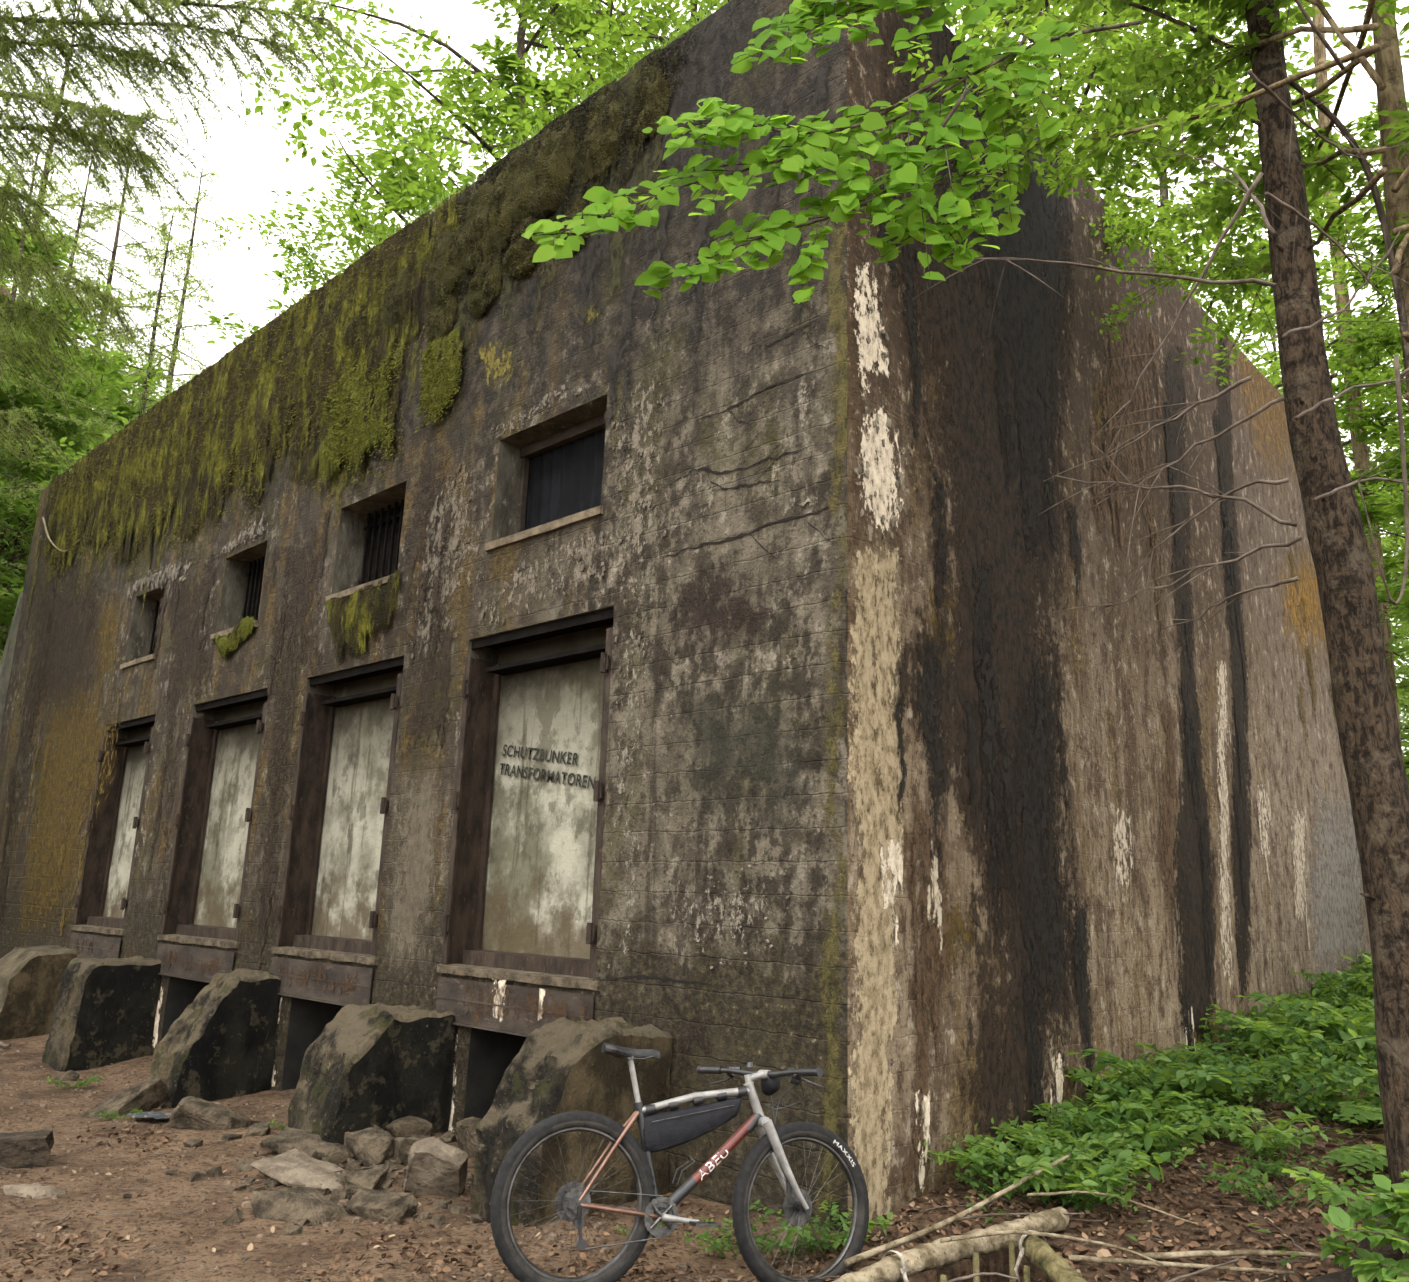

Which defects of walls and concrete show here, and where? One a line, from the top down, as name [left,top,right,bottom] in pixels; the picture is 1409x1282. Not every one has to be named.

crack [667,294,828,491]
crack [662,503,848,558]
damp [853,7,1274,1201]
damp [1291,809,1311,961]